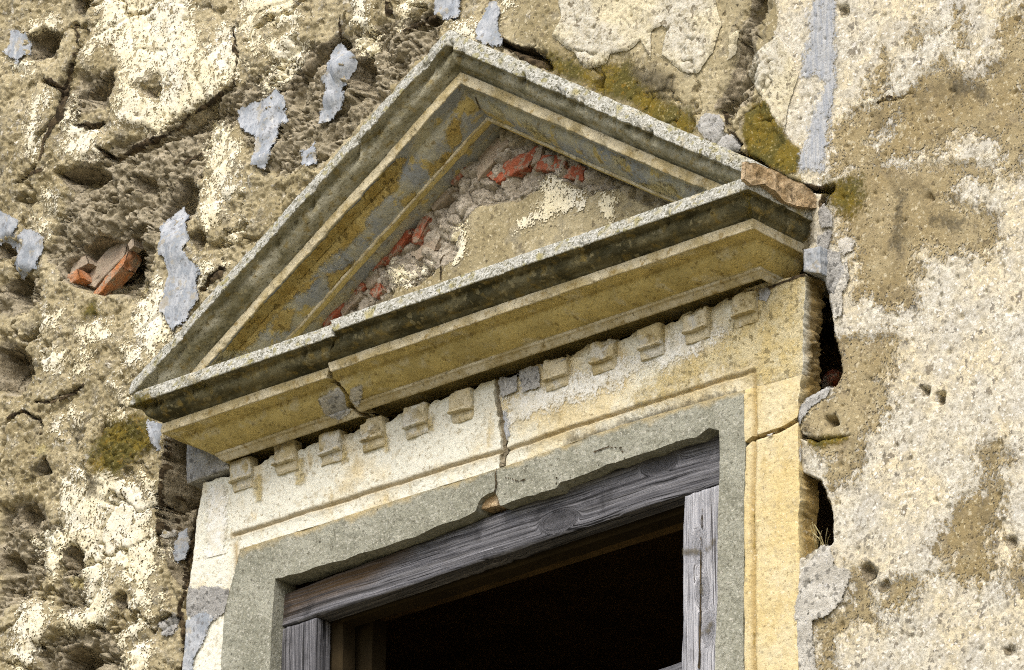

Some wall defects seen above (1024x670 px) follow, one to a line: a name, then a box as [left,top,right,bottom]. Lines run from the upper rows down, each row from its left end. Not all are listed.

flaking render [552,0,740,74]
peeling [0,0,519,430]
spalling [323,138,620,328]
peeling [42,401,85,444]
crack [494,379,525,493]